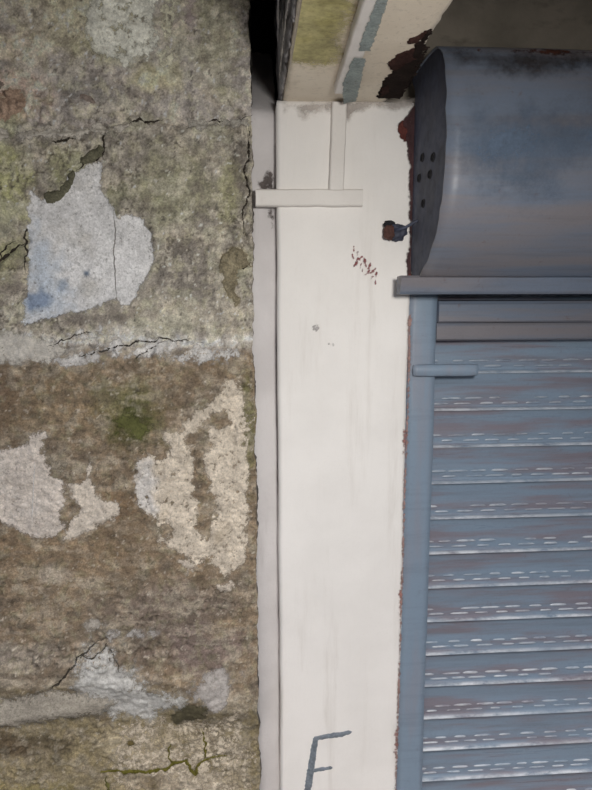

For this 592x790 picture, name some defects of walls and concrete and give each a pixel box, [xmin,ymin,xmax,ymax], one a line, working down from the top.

crack [0,223,29,273]
spalling [21,145,155,326]
crack [76,132,106,171]
crack [130,116,162,124]
corrosion [398,106,415,275]
crack [45,331,203,360]
flaking render [0,430,120,540]
flaking render [133,379,255,592]
crack [100,731,227,790]
flaking render [112,700,257,790]